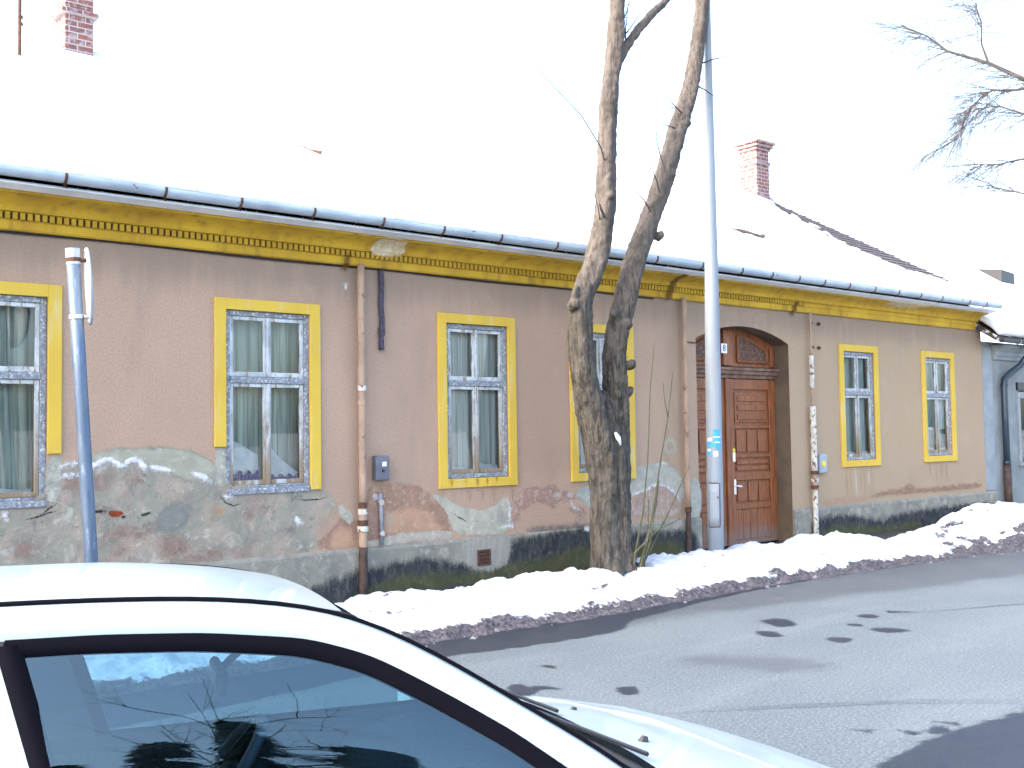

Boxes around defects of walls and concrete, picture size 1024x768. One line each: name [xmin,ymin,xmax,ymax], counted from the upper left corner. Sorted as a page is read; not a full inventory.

peeling [0,455,84,566]
peeling [92,445,454,564]
water stain [311,519,591,601]
peeling [497,484,589,533]
peeling [630,462,684,519]
water stain [632,527,702,558]
water stain [810,501,991,536]